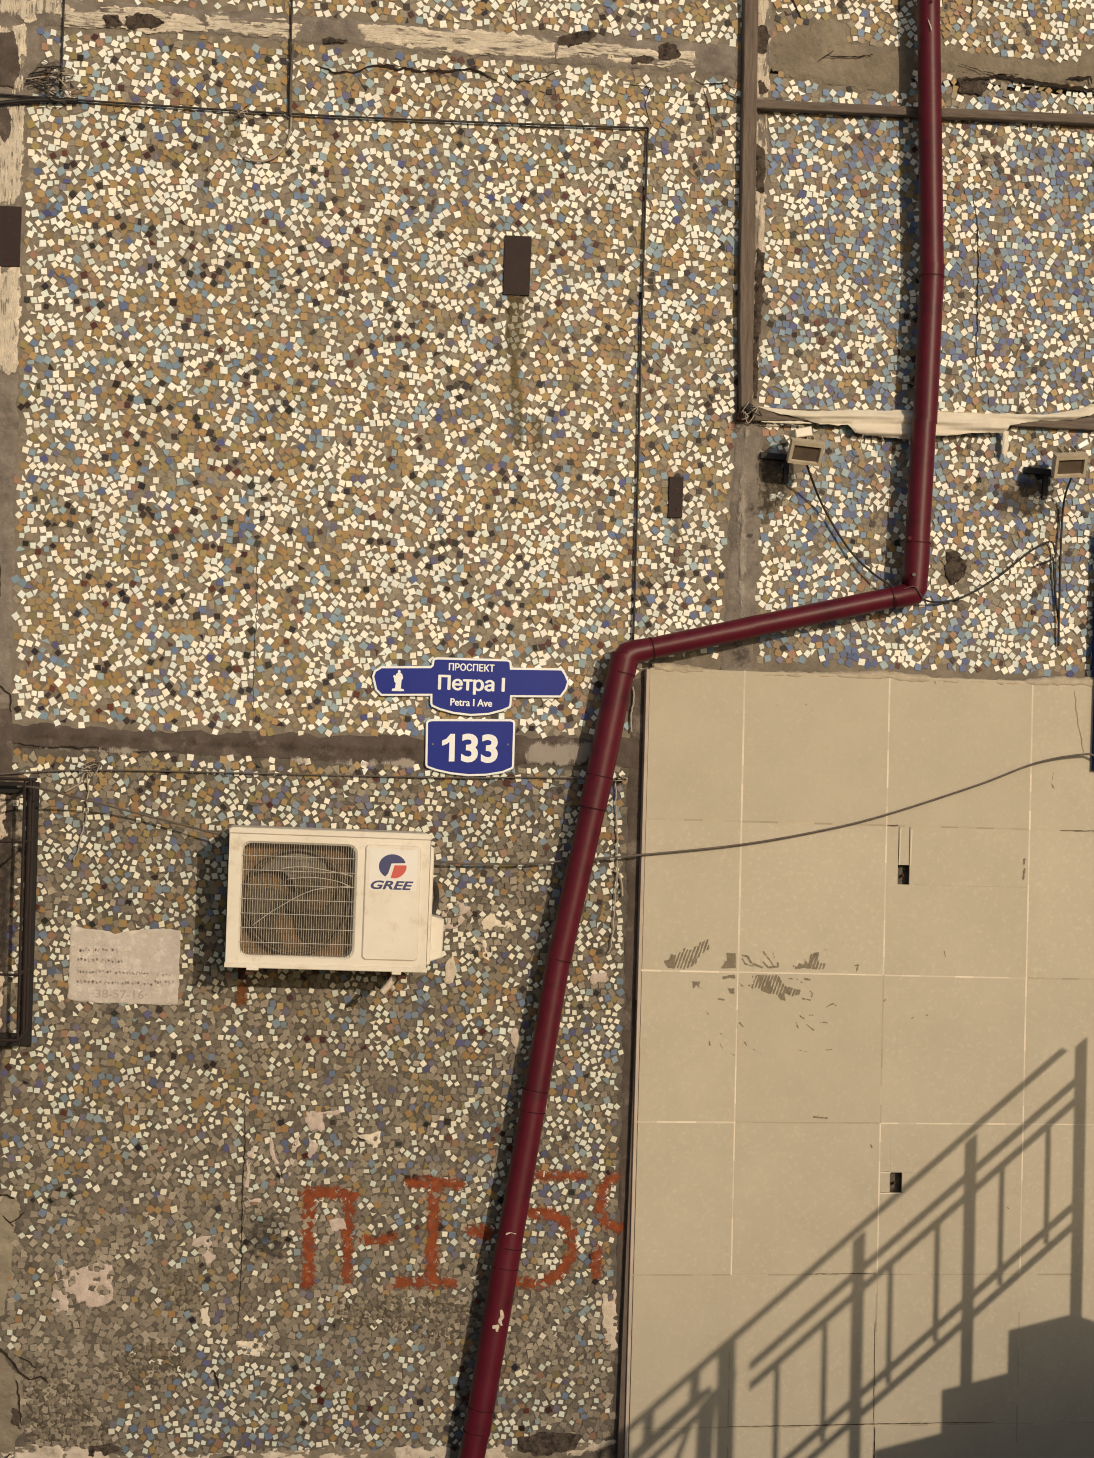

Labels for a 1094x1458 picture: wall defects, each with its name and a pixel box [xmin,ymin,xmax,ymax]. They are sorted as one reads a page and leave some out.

peeling [322,24,695,68]
crack [315,64,558,85]
spalling [957,76,987,96]
crack [0,1188,25,1226]
crack [0,1348,48,1458]
spalling [0,1362,460,1458]
crack [728,1334,988,1458]
spalling [485,1432,617,1458]